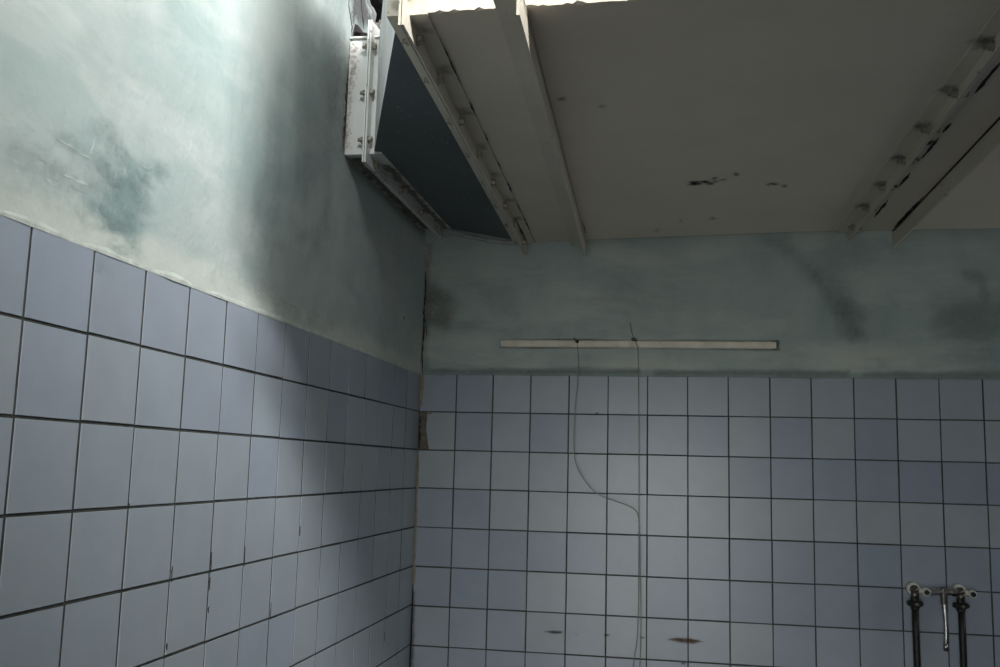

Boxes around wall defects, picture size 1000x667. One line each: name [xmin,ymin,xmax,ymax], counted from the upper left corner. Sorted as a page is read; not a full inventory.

spalling [418,412,433,449]